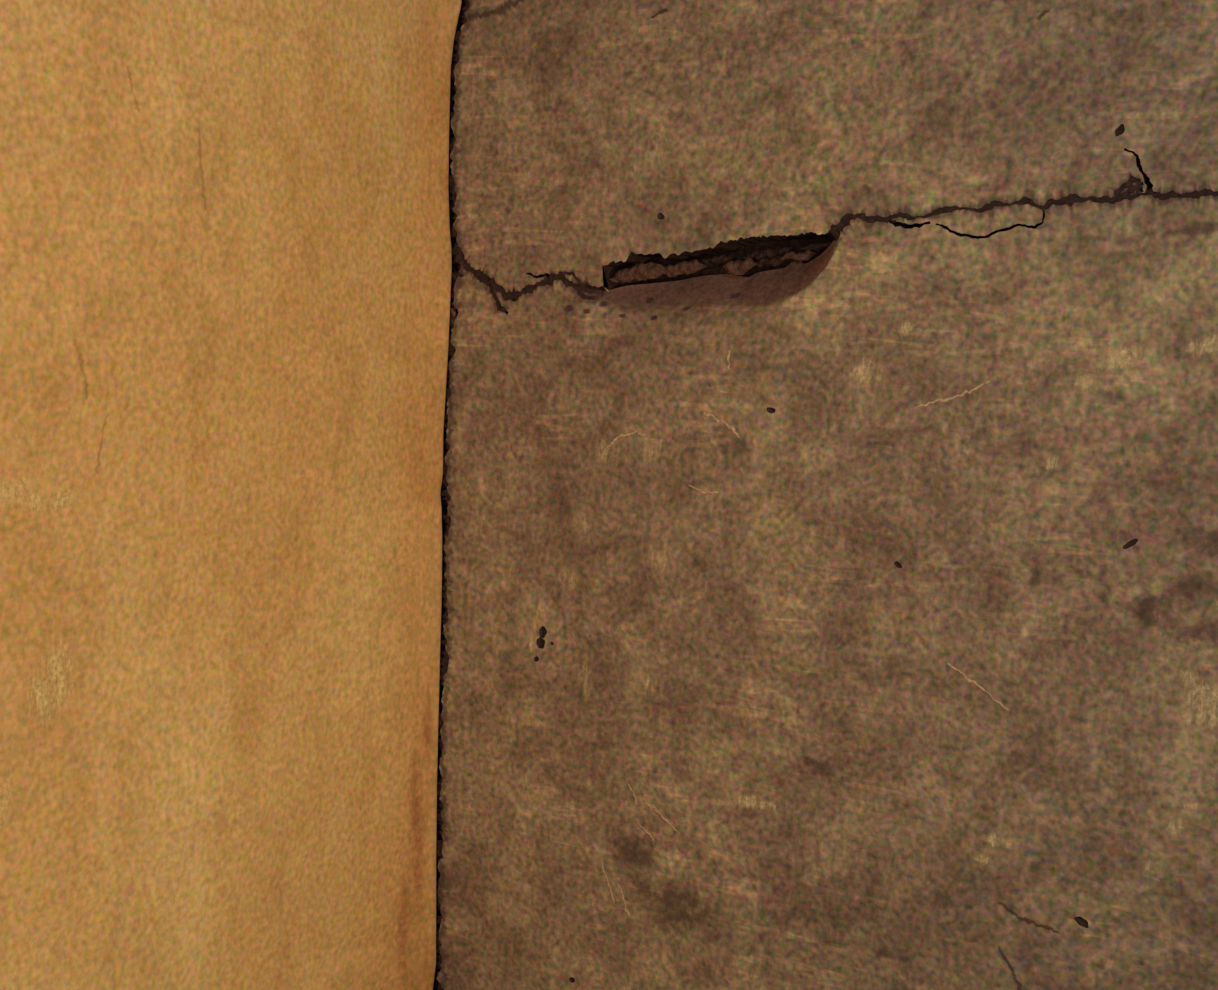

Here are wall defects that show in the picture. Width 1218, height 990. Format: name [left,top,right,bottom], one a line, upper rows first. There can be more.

crack [827,148,1218,241]
spalling [565,232,840,320]
crack [433,0,609,990]